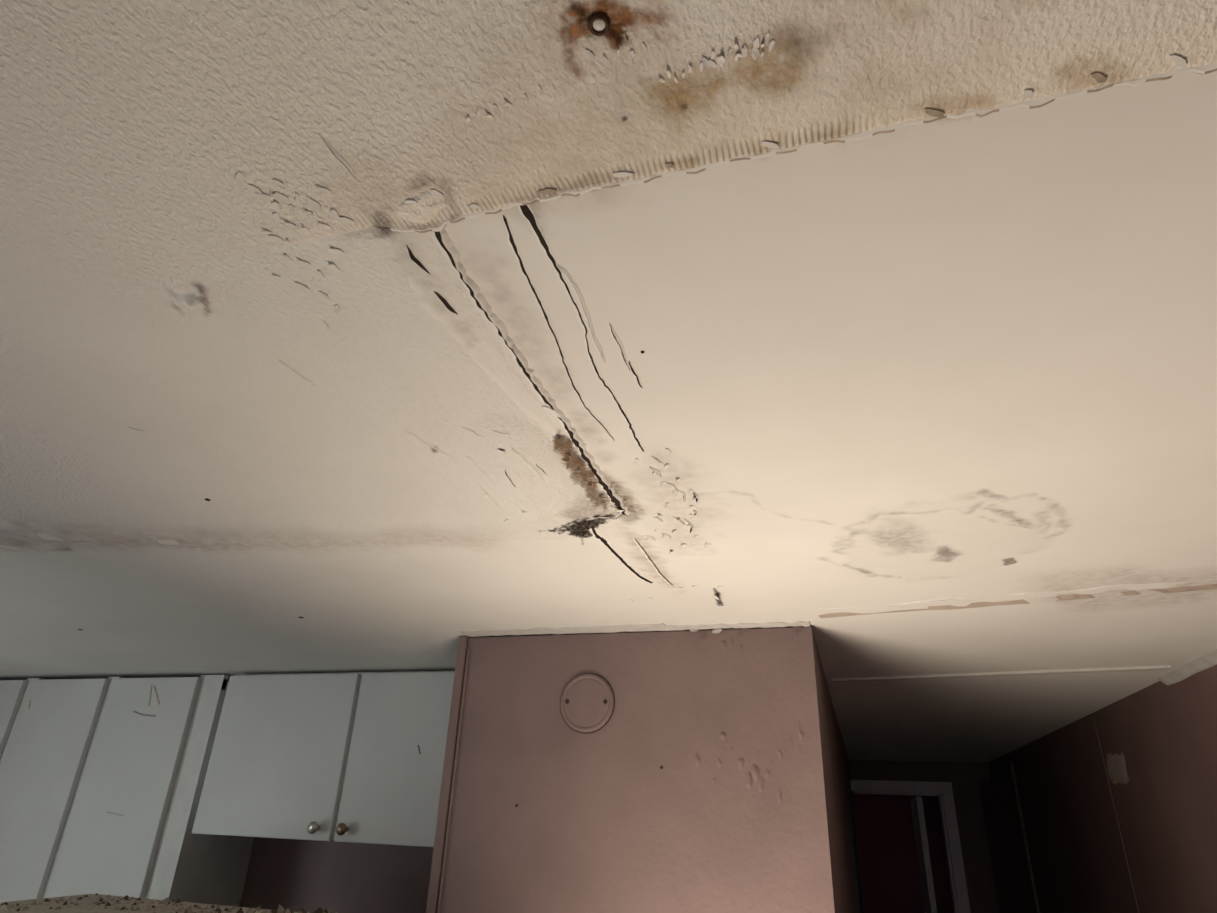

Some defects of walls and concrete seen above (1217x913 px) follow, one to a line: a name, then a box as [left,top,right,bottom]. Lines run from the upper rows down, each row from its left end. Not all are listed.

rust [561,1,663,75]
peeling [658,31,775,83]
crack [431,204,675,585]